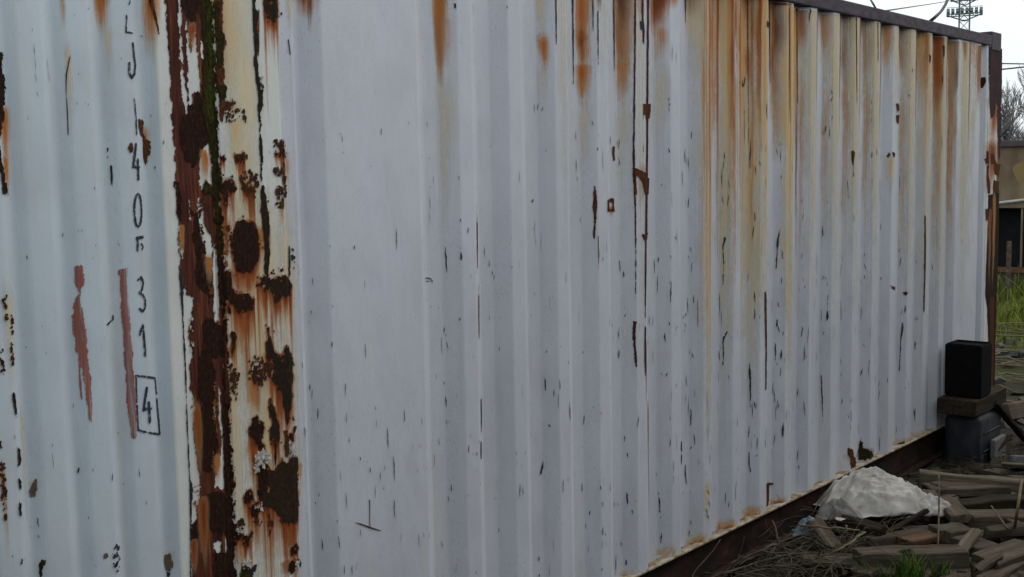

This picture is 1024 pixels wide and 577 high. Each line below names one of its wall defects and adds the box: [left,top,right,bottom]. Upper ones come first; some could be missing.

corrosion [213,0,235,122]
corrosion [434,0,456,74]
corrosion [0,52,9,195]
corrosion [770,2,986,219]
corrosion [219,152,256,244]
corrosion [538,0,701,385]
spalling [163,0,306,577]
corrosion [283,416,297,457]
corrosion [847,441,874,469]
corrosion [243,488,263,541]
corrosion [718,483,785,529]
corrosion [164,553,173,577]